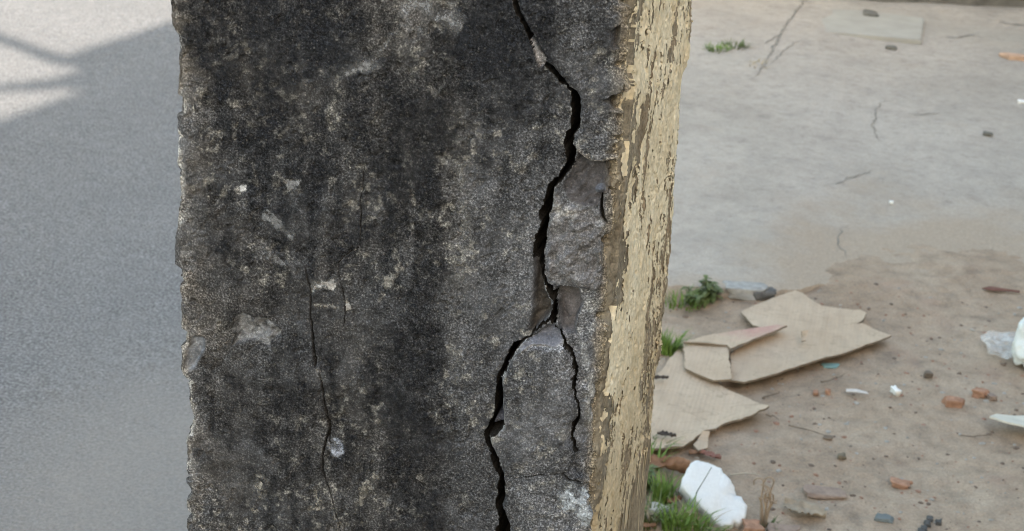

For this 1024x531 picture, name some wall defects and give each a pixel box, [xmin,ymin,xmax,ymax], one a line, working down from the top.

crack [484,0,591,531]
peeling [520,0,693,531]
crack [601,175,617,222]
crack [751,0,806,79]